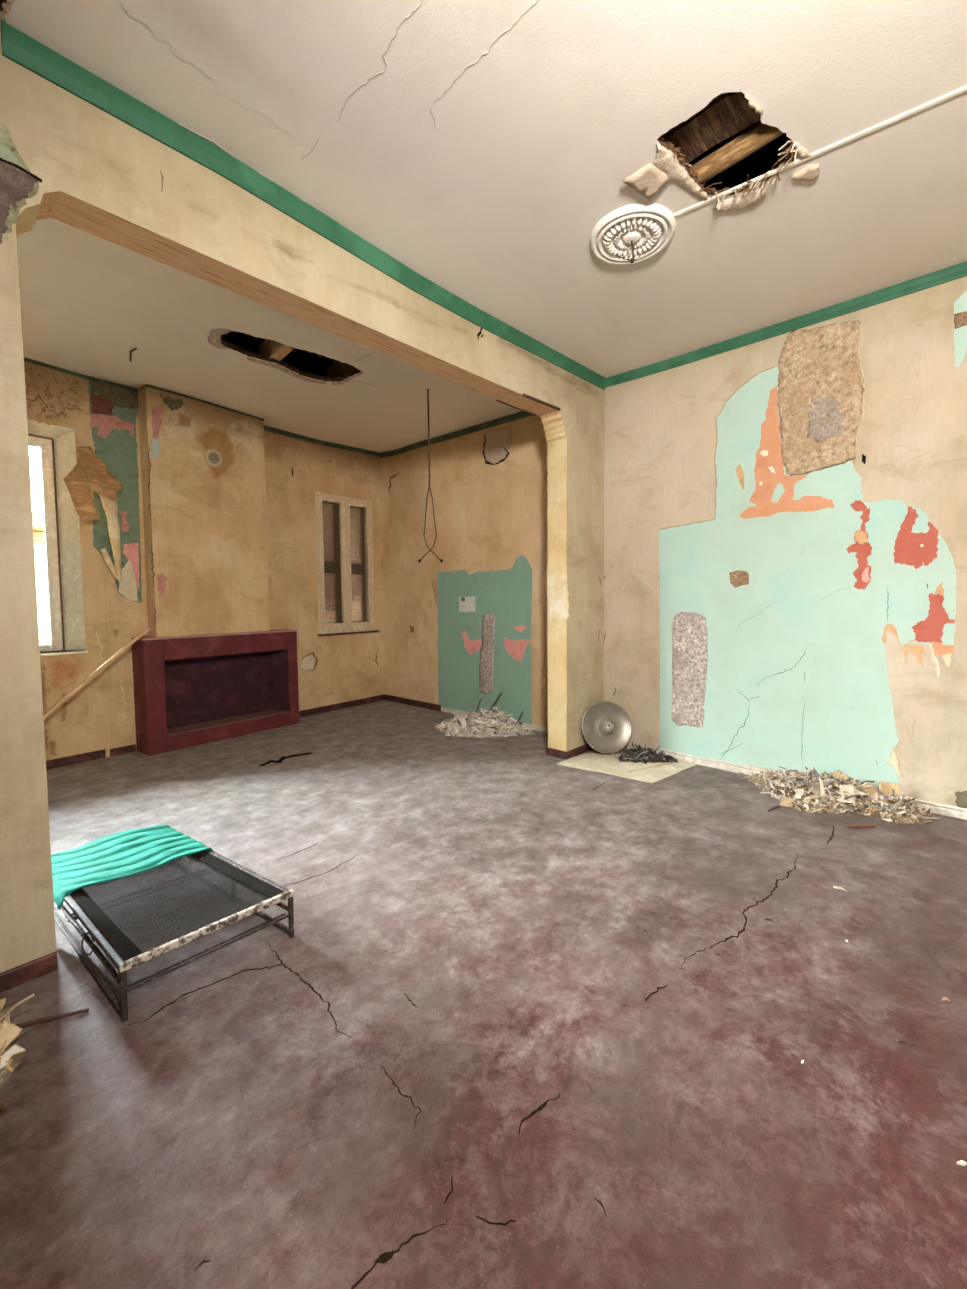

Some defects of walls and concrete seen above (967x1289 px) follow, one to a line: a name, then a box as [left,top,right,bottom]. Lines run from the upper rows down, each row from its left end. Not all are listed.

spalling [0,122,42,244]
crack [179,124,305,202]
spalling [208,329,232,350]
peeling [88,380,183,602]
peeling [659,320,957,790]
peeling [431,555,532,725]
spalling [955,791,967,809]
crack [645,827,835,1001]
crack [130,941,351,1037]
crack [379,1064,422,1130]
crack [519,1093,560,1135]
crack [351,1179,516,1289]